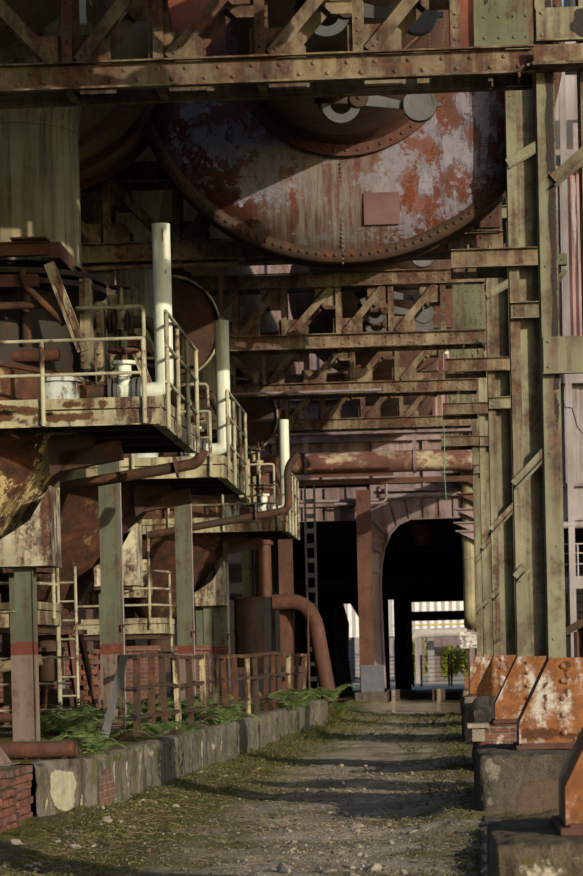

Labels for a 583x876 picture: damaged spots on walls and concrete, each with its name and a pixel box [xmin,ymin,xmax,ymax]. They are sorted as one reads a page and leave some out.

peeling [169,97,289,207]
corrosion [401,137,441,224]
peeling [415,87,497,219]
corrosion [0,399,107,423]
corrosion [521,682,580,742]